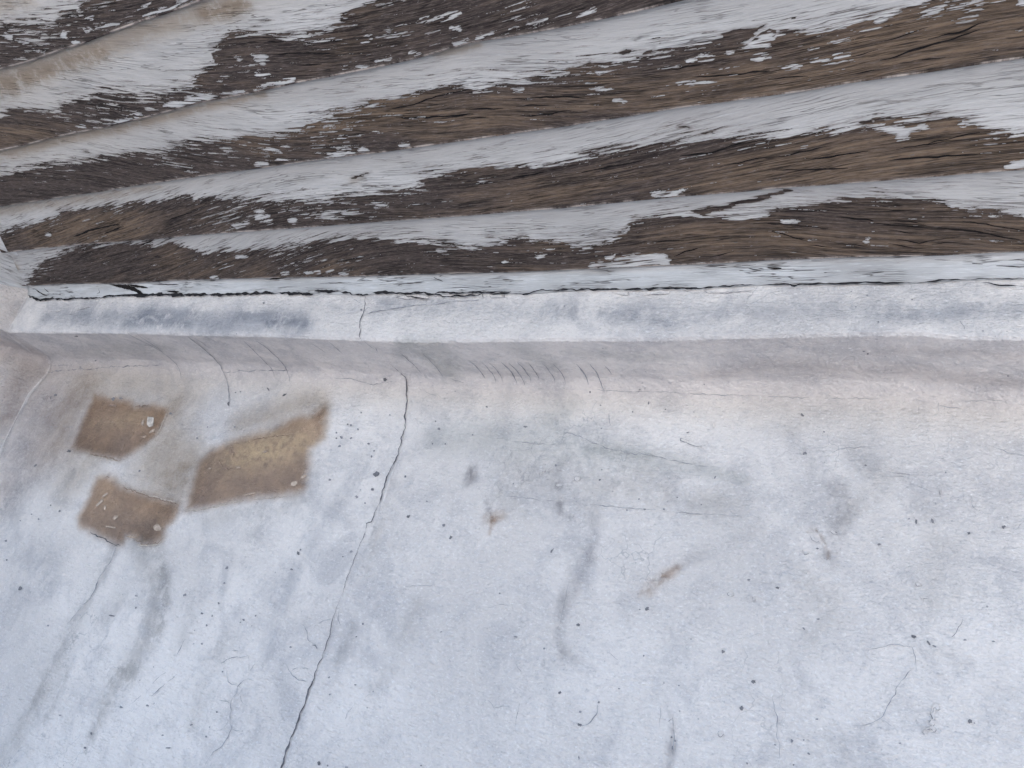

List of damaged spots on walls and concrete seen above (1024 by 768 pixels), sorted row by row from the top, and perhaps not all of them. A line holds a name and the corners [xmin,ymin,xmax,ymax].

peeling [0,0,1024,285]
spalling [135,405,172,438]
crack [28,210,1024,768]